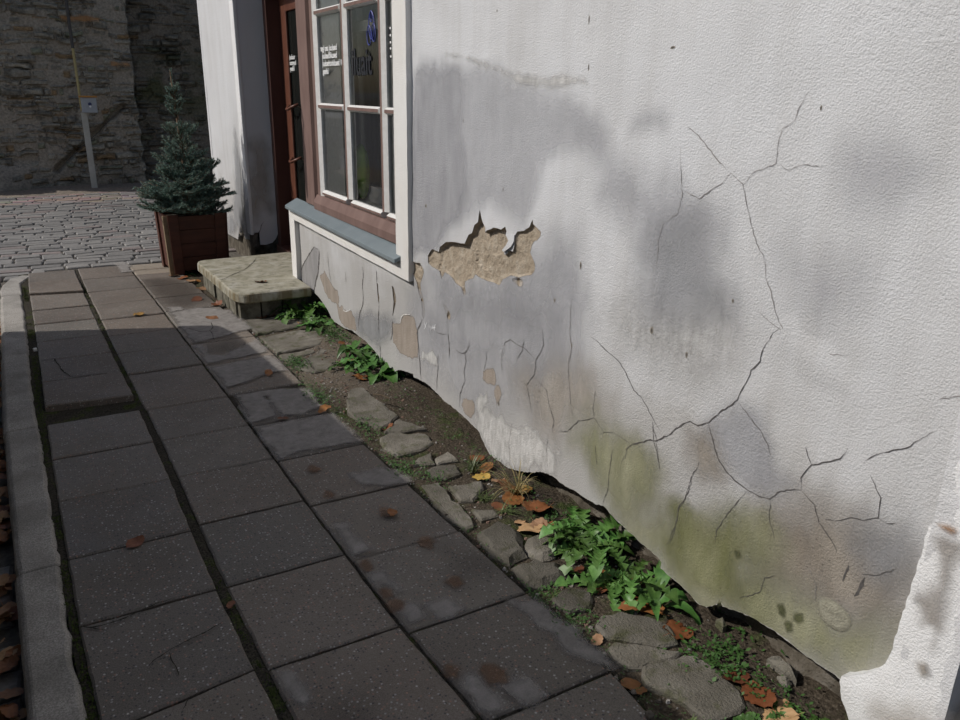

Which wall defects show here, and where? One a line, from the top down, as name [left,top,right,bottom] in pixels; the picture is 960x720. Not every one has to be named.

leakage [412,58,600,248]
peeling [320,271,356,331]
crack [301,247,396,357]
flaking render [392,211,541,358]
leakage [611,174,718,308]
crack [417,95,934,549]
mould [778,605,803,632]